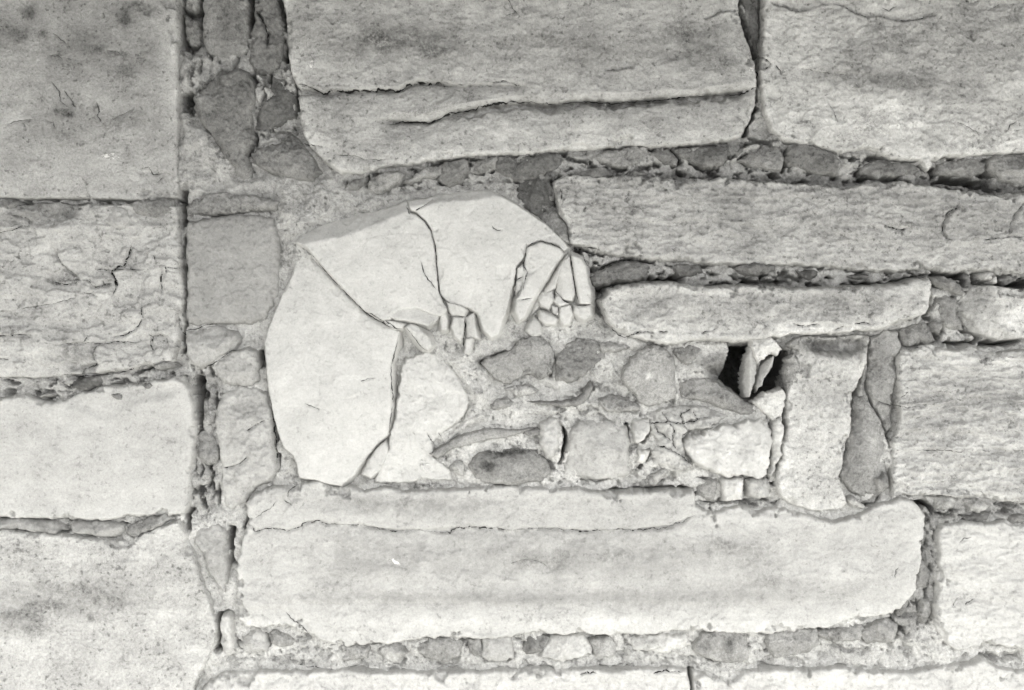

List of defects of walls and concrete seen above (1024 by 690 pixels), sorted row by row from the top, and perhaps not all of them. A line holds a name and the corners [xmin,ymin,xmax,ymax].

crack [297,82,461,95]
crack [392,58,858,131]
crack [23,248,180,309]
crack [407,203,466,346]
crack [513,241,627,306]
crack [55,309,217,377]
crack [313,256,433,460]
peeling [737,337,801,479]